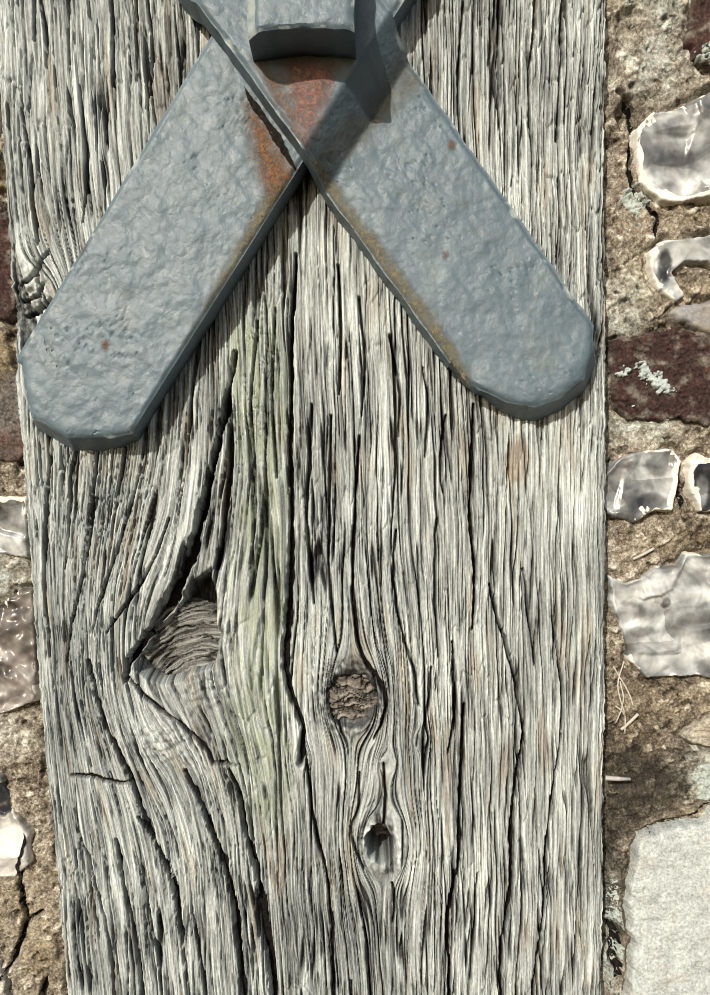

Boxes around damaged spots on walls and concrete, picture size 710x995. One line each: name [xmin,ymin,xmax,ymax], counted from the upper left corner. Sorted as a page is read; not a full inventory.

rust [265,62,332,138]
rust [249,106,292,197]
crack [0,833,43,981]
crack [41,976,49,995]